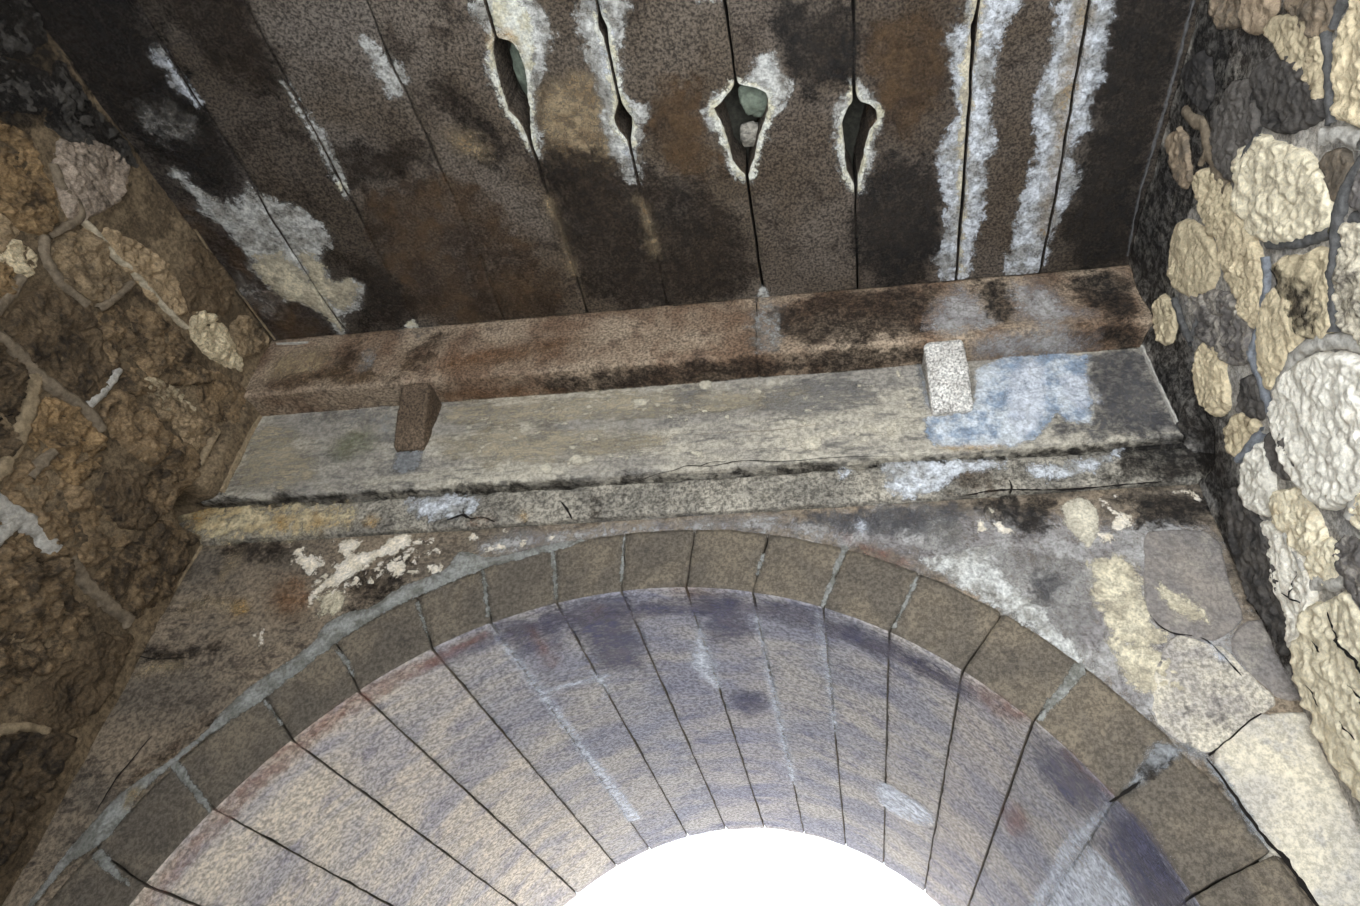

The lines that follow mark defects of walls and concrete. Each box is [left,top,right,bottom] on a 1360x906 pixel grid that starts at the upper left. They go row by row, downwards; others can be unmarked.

damp [29,0,432,336]
spalling [484,30,538,151]
spalling [700,51,794,183]
spalling [832,77,885,194]
damp [178,0,1247,736]
crack [1281,572,1360,740]